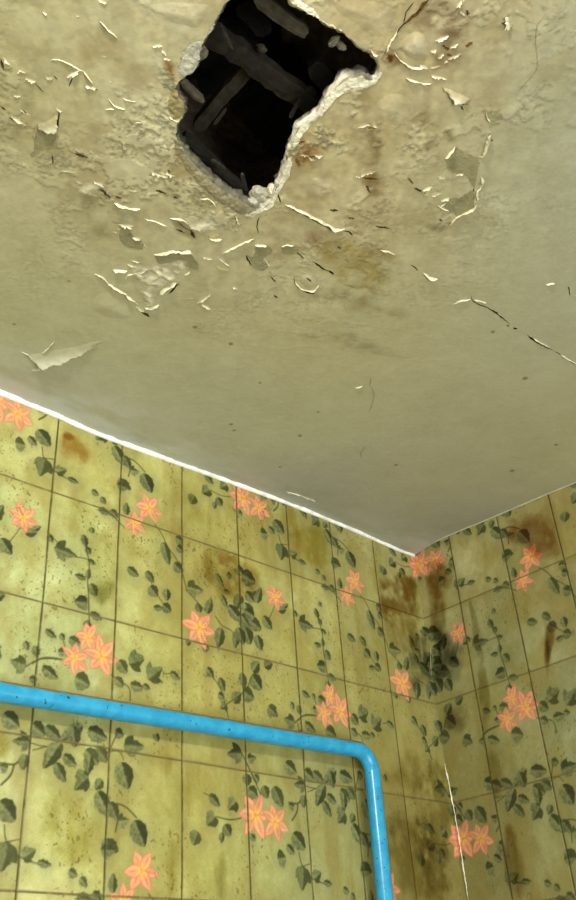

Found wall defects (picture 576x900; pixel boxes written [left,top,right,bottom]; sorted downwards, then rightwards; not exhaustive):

spalling [146,0,473,242]
peeling [408,134,493,226]
crack [381,250,438,281]
peeling [22,341,103,371]
crack [454,298,575,364]